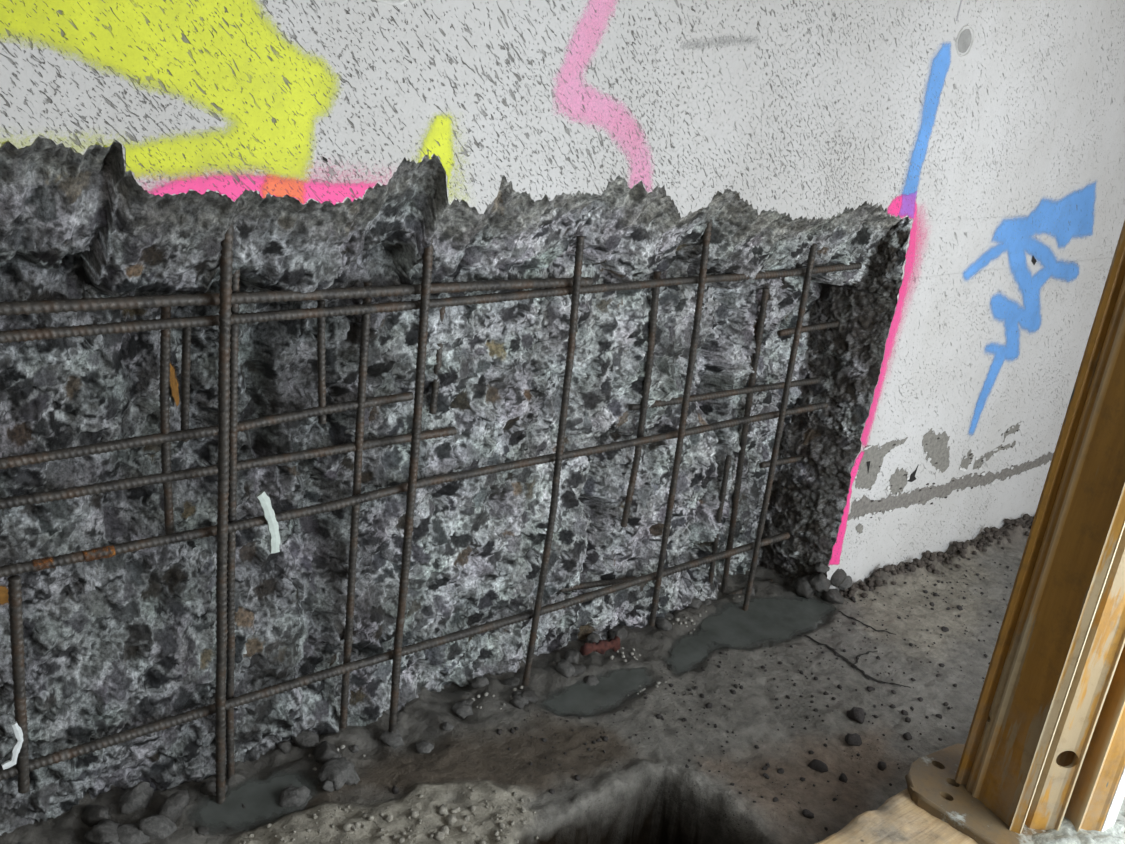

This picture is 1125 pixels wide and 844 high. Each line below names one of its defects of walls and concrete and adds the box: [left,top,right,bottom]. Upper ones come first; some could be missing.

spalling [0,136,1054,836]